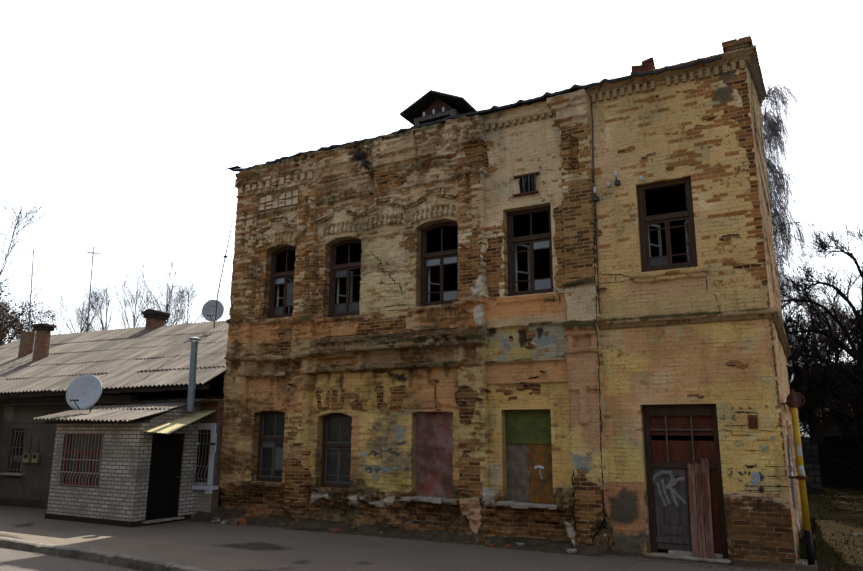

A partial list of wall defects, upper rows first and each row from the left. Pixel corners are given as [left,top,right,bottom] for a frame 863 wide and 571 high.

peeling [462,133,498,173]
crack [364,254,413,321]
spalling [454,382,541,425]
spalling [353,441,603,544]
leakage [610,489,638,523]